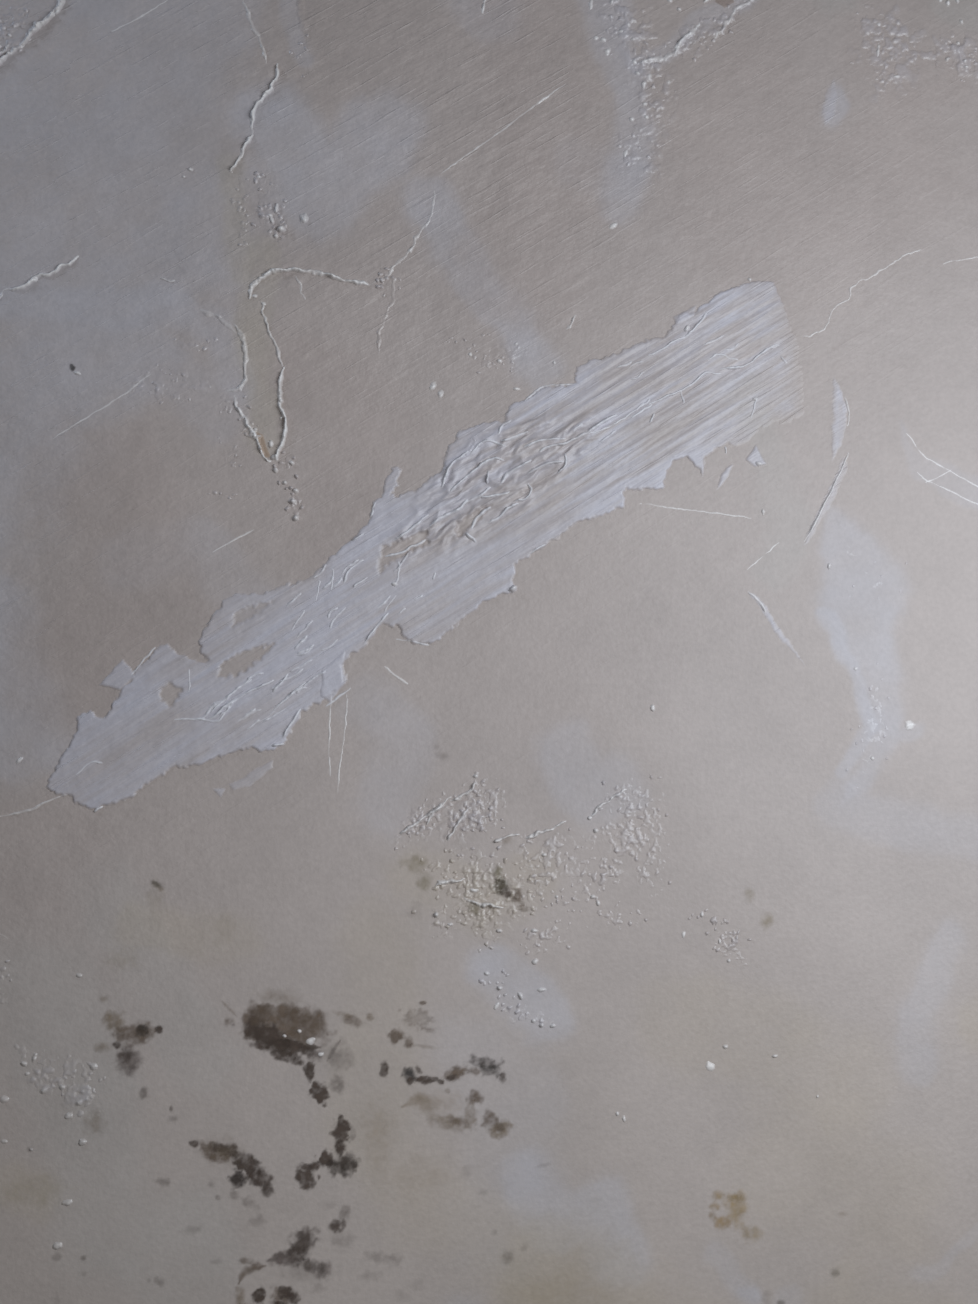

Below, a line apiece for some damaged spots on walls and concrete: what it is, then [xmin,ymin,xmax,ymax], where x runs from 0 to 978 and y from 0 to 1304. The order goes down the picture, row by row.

water stain [107,1015,162,1067]
water stain [243,1005,328,1106]
water stain [405,1067,465,1084]
water stain [190,1141,272,1192]
water stain [295,1115,357,1189]
water stain [241,1231,312,1278]
water stain [239,1287,297,1304]